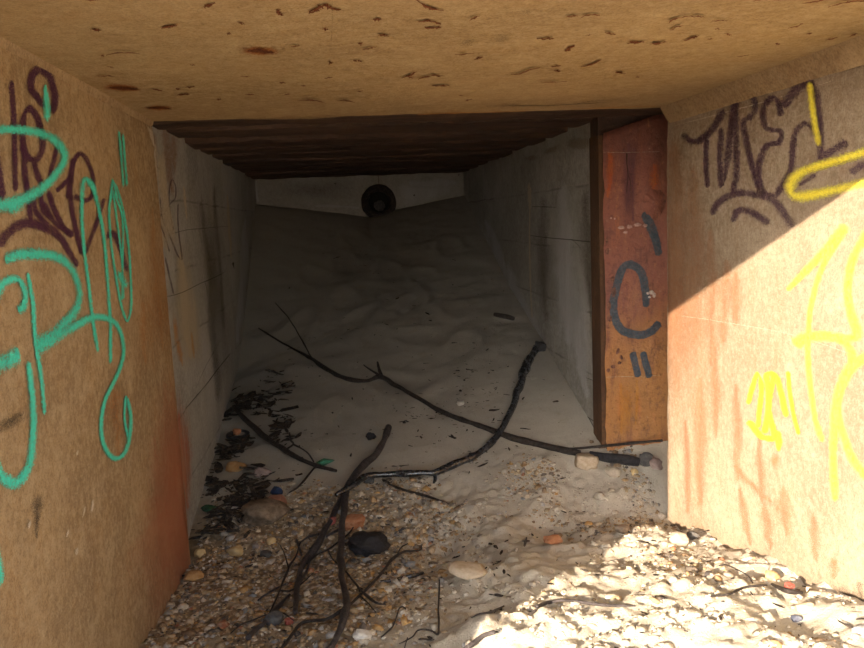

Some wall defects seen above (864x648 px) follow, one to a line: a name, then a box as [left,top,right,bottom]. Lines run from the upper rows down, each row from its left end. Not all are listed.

corrosion [416,0,444,29]
corrosion [240,46,279,56]
corrosion [102,66,141,92]
corrosion [732,383,794,547]